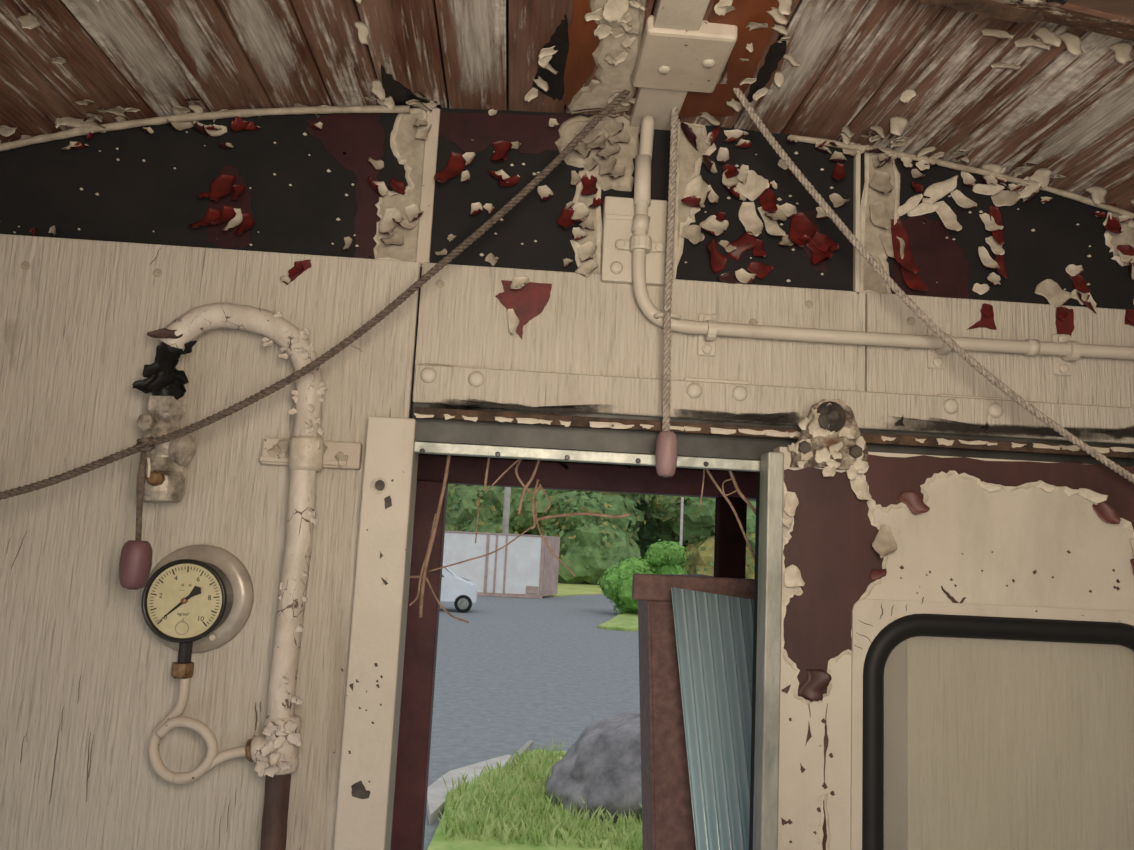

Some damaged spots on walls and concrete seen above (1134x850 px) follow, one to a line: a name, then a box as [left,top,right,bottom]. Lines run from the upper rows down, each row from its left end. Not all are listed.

peeling [230,0,291,84]
peeling [54,99,140,152]
peeling [167,98,261,149]
peeling [188,165,259,249]
peeling [294,0,647,277]
peeling [673,0,1134,337]
peeling [495,276,552,339]
peeling [589,421,654,429]
peeling [669,403,1134,705]
peeling [254,676,303,778]
peeling [805,718,834,758]
peeling [813,783,835,850]